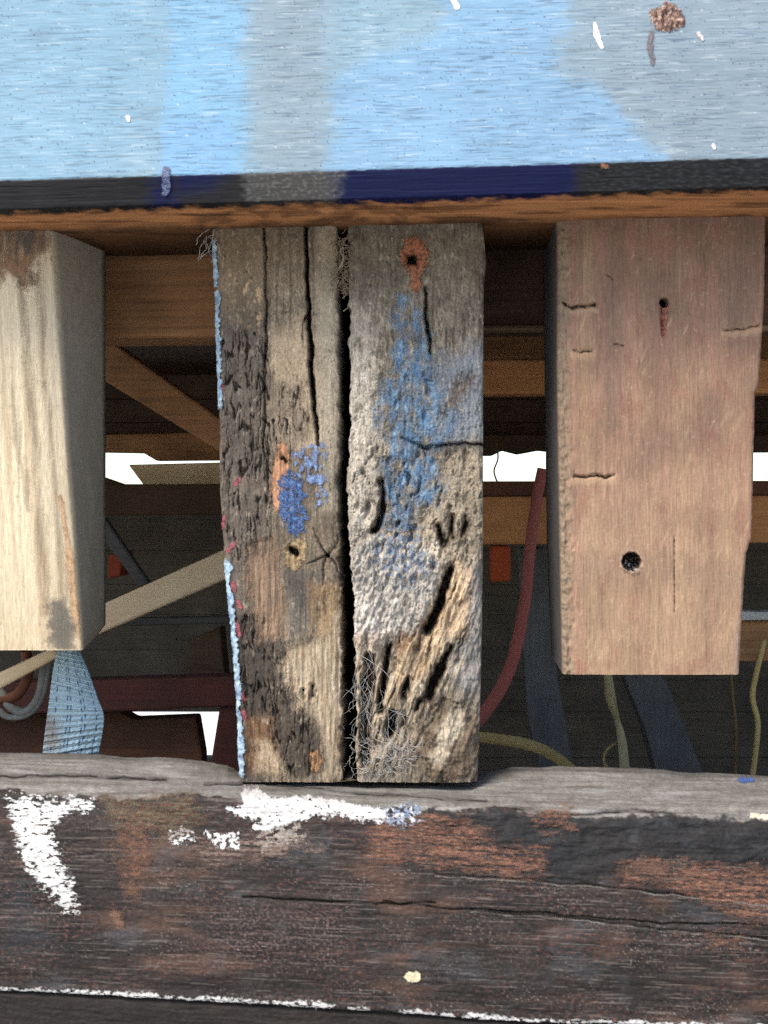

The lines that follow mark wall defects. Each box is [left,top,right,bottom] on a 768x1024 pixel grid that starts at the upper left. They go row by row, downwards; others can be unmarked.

corrosion [647,1,685,66]
corrosion [399,235,429,293]
corrosion [660,305,668,337]
crack [403,438,483,450]
crack [222,228,358,789]
crack [244,895,344,903]
crack [435,875,526,883]
crack [555,881,606,889]
crack [379,891,768,941]